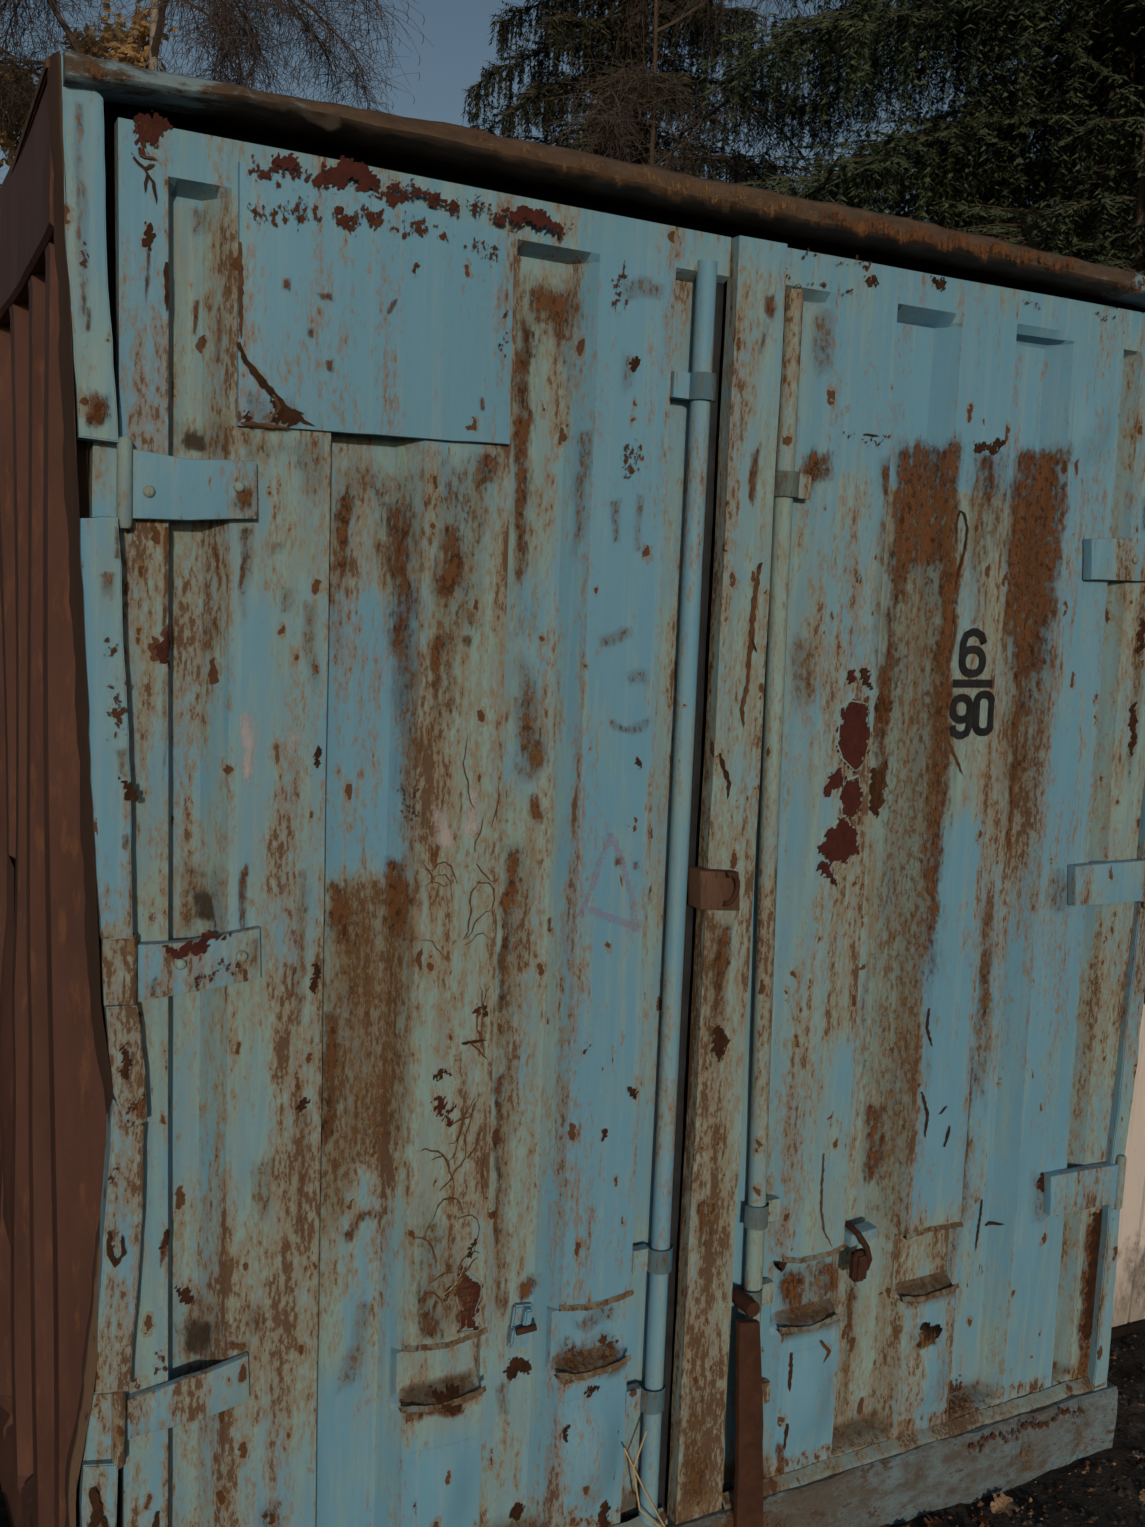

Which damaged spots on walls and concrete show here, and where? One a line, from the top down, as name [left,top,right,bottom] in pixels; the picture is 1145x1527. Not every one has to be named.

corrosion [131,109,173,155]
corrosion [142,221,169,311]
peeling [247,152,574,251]
corrosion [498,285,578,585]
corrosion [334,454,497,821]
peeling [817,668,873,887]
corrosion [864,437,1071,1223]
corrosion [291,860,415,1225]
corrosion [706,927,731,1062]
corrosion [174,1281,210,1363]
corrosion [497,1357,532,1413]
corrosion [774,1261,857,1401]